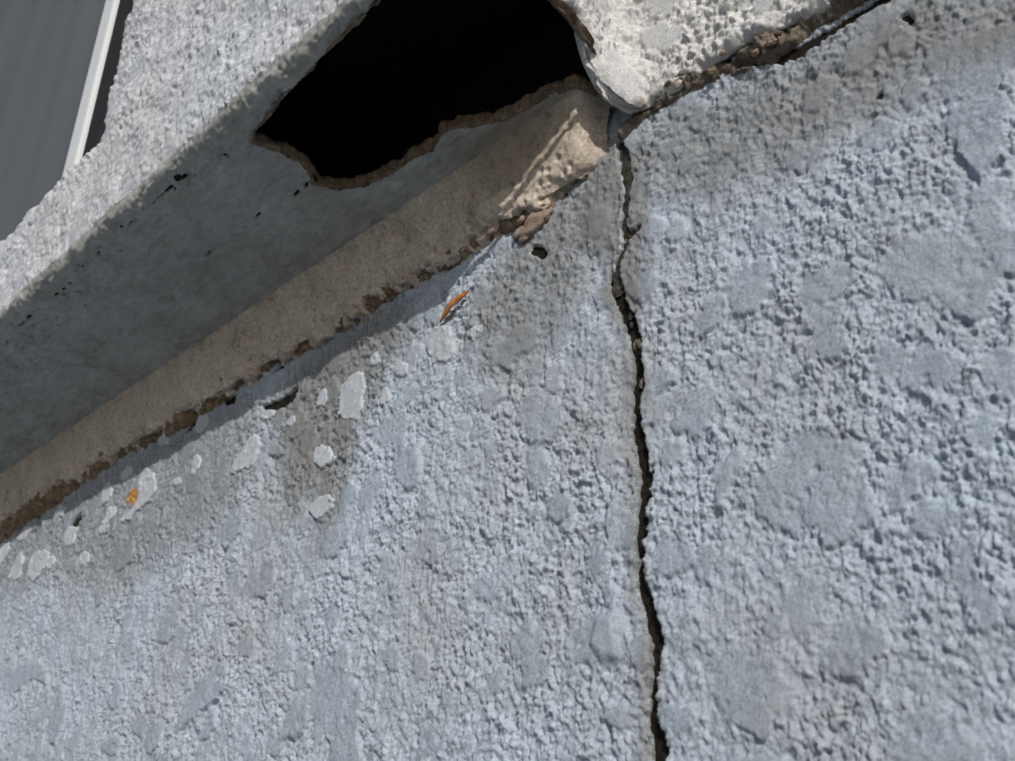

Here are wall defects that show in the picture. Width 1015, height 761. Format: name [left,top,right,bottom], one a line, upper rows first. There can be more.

hole [251,0,598,191]
crack [776,0,891,65]
crack [611,143,670,761]